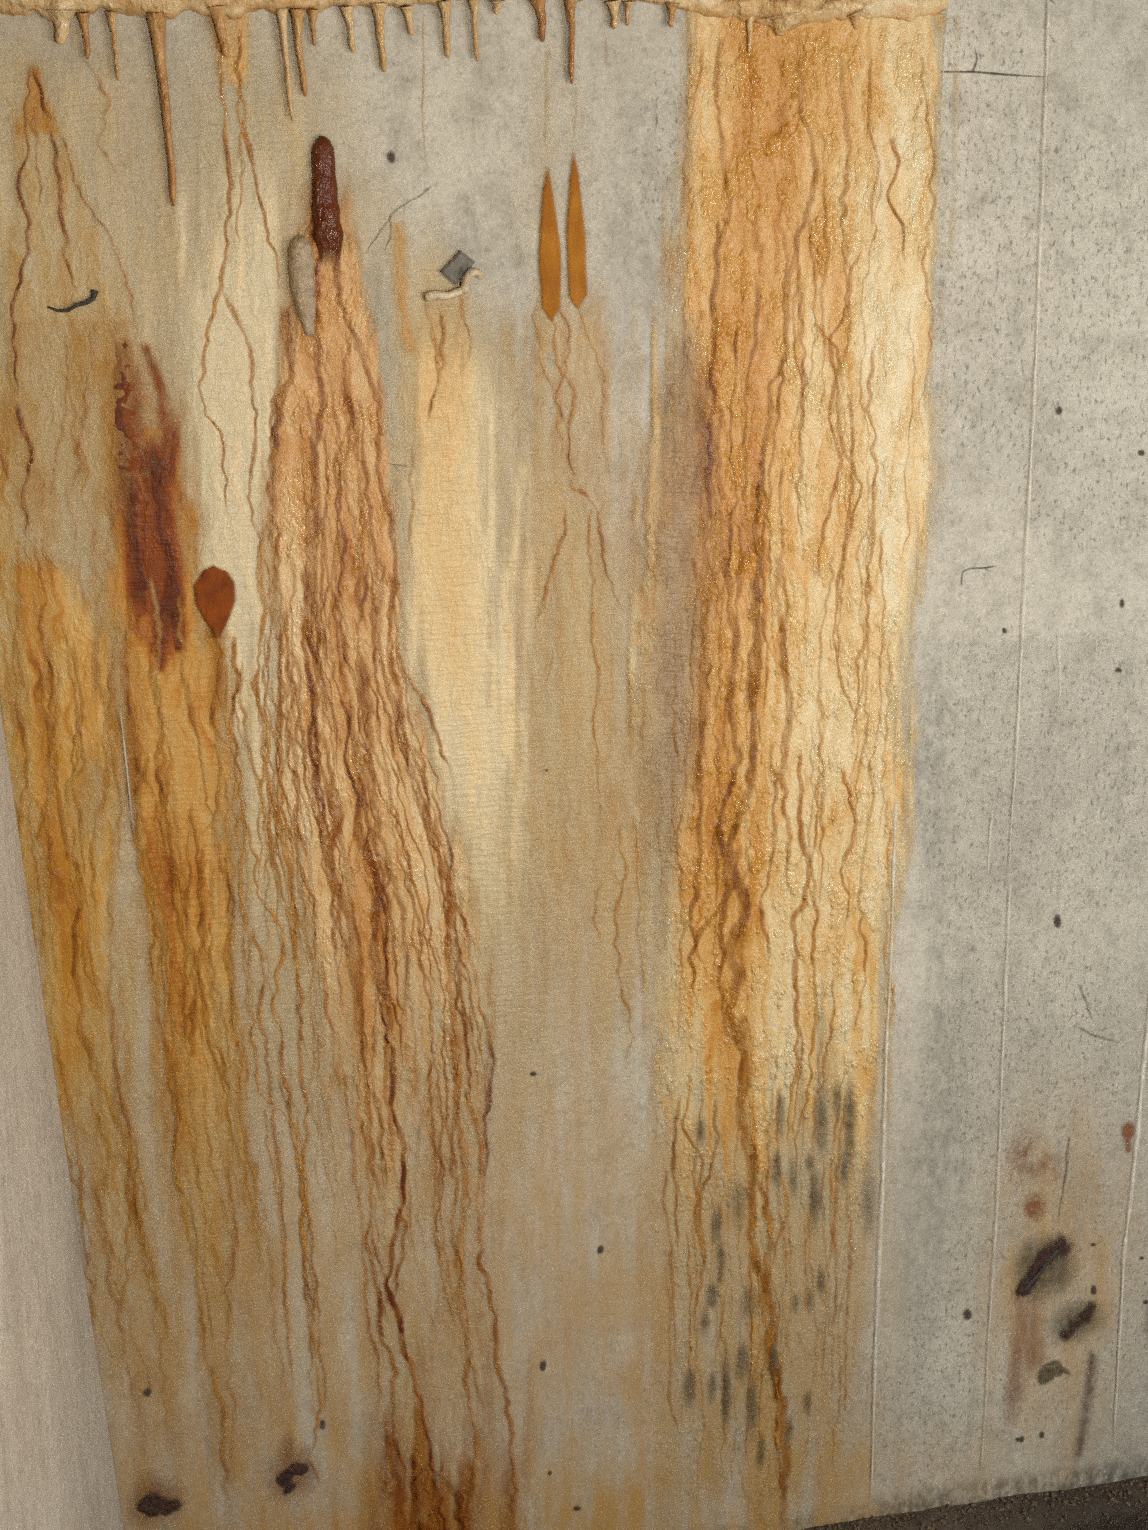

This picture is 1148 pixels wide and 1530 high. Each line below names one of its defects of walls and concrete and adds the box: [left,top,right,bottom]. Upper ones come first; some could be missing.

corrosion [0,66,257,1343]
water stain [0,0,505,1441]
corrosion [261,136,519,1530]
water stain [395,225,643,992]
water stain [529,0,546,42]
water stain [565,0,584,84]
corrosion [534,11,944,1500]
water stain [604,0,948,53]